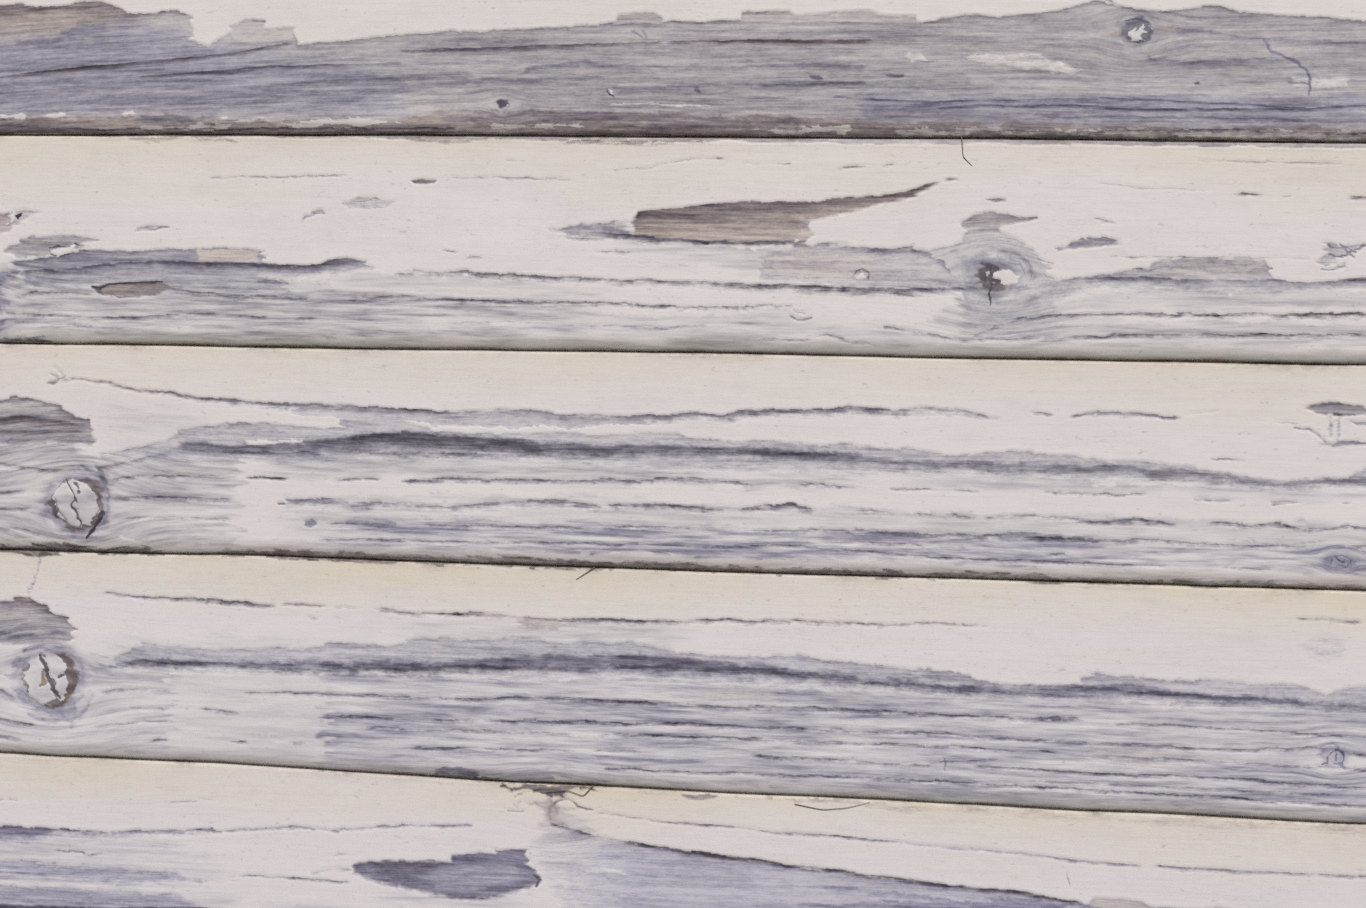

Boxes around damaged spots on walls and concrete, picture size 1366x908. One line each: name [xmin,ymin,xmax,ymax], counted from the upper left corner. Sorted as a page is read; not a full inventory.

peeling [0,0,1366,150]
peeling [837,162,897,171]
peeling [0,207,376,338]
peeling [546,177,1366,339]
peeling [0,394,1366,493]
peeling [52,479,100,527]
peeling [276,496,1366,551]
peeling [0,595,79,705]
peeling [84,635,1366,720]
peeling [0,822,474,887]
peeling [228,820,1227,908]